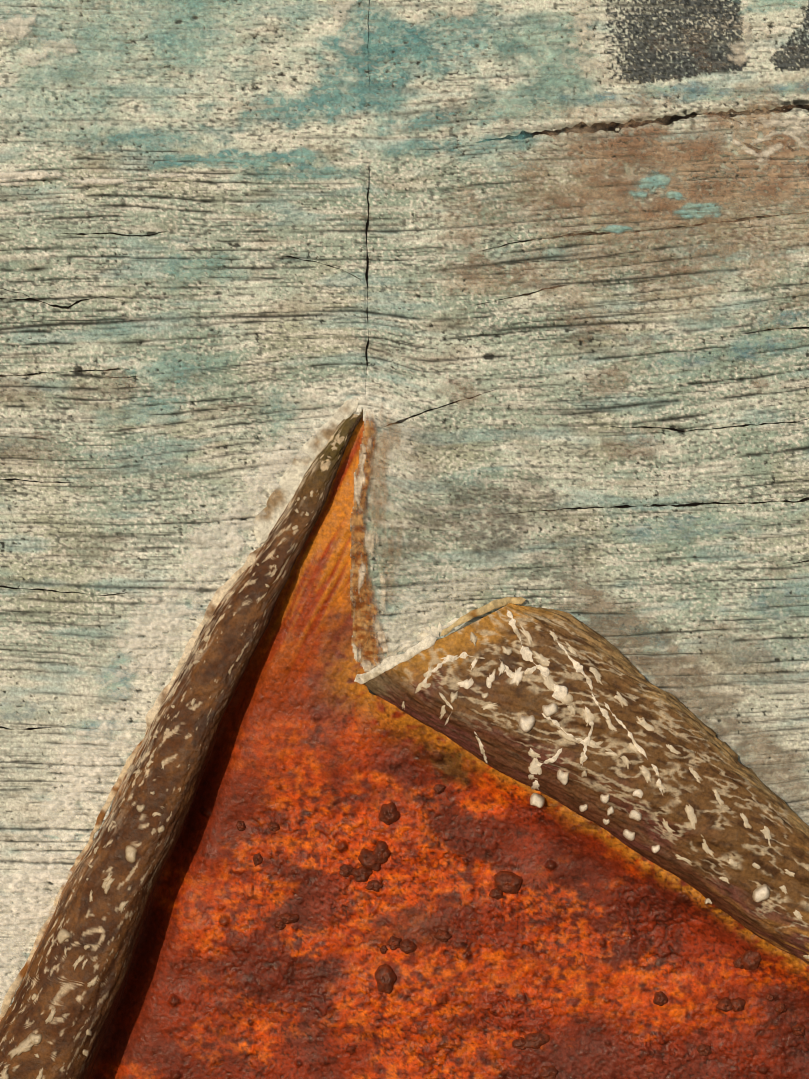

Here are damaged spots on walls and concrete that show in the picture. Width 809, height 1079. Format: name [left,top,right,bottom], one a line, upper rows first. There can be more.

crack [475,104,809,160]
peeling [354,440,371,504]
peeling [359,530,373,587]
rust [350,420,383,672]
peeling [0,398,363,1079]
peeling [352,597,809,965]